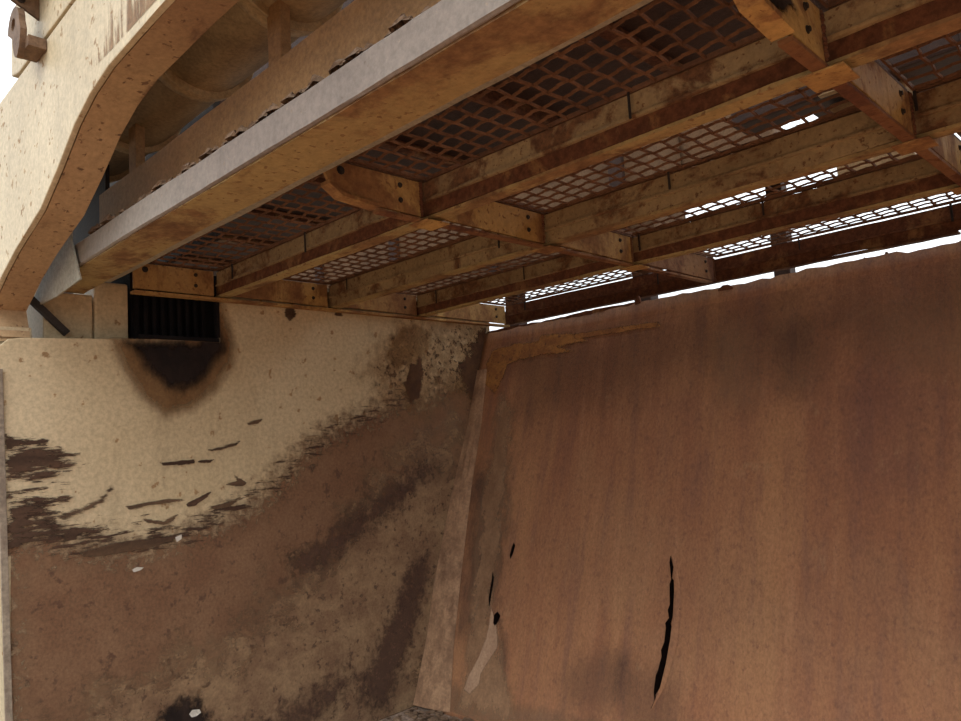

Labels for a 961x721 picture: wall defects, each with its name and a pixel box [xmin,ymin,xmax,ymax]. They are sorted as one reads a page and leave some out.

water stain [211,497,241,510]
water stain [82,514,178,557]
crack [651,556,681,709]